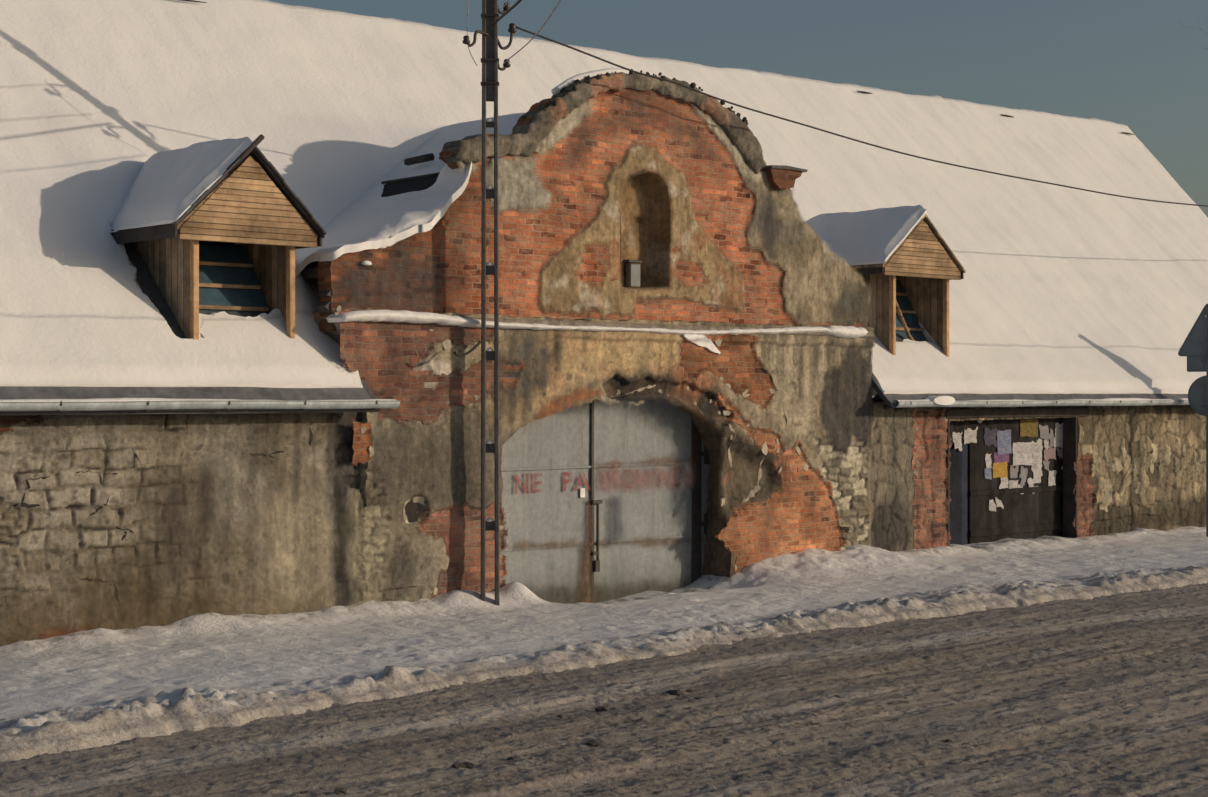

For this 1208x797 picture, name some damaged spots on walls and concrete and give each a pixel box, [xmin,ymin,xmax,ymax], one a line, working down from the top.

flaking render [0,415,45,434]
flaking render [334,306,526,466]
flaking render [602,334,850,577]
damp [821,335,875,455]
flaking render [403,497,509,599]